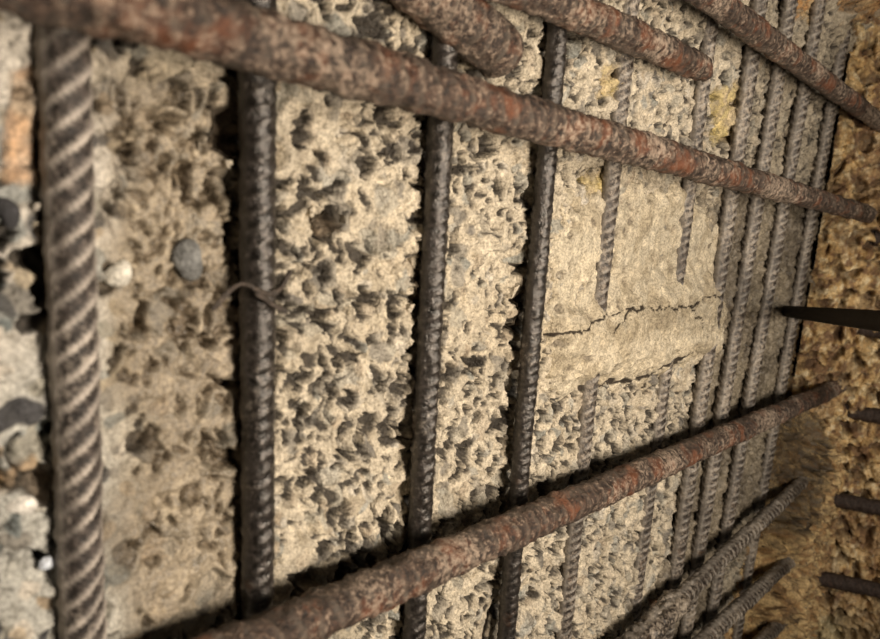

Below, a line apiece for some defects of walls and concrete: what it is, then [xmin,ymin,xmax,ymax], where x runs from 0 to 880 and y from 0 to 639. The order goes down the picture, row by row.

rust [597,64,620,98]
rust [709,82,739,141]
rust [796,0,814,23]
rust [837,0,880,111]
spalling [0,0,880,511]
rust [807,107,880,310]
spalling [34,25,108,639]
spalling [191,115,846,639]
crack [543,295,720,337]
crack [578,352,693,392]
rust [0,457,37,488]
rust [724,320,880,639]